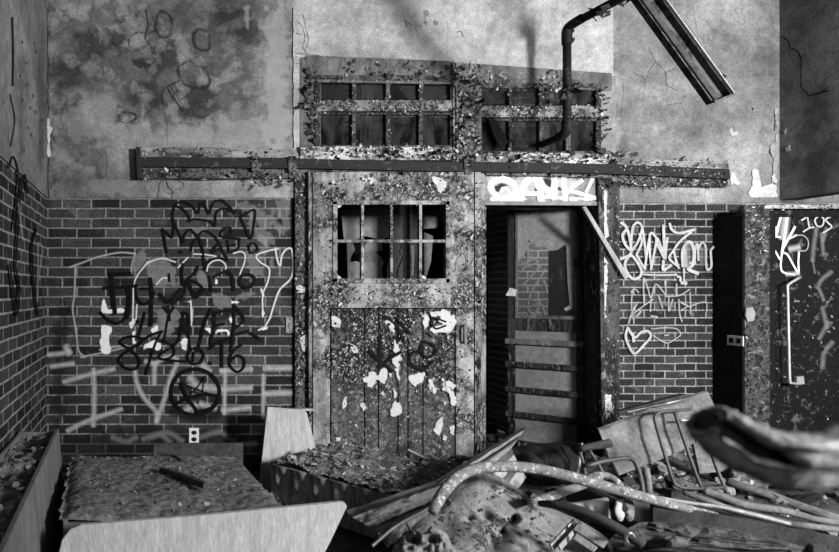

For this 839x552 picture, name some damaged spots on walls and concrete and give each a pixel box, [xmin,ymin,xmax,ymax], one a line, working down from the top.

damp [120,9,187,44]
damp [123,39,213,122]
crack [781,36,830,96]
spalling [746,108,791,255]
peeling [142,16,740,448]